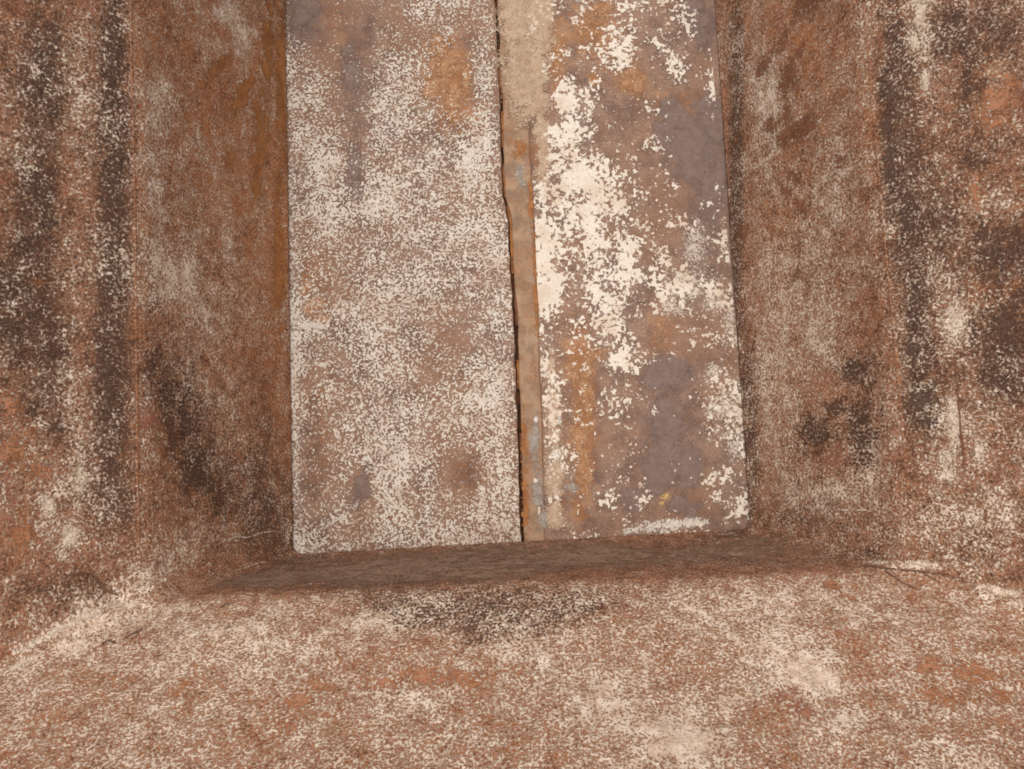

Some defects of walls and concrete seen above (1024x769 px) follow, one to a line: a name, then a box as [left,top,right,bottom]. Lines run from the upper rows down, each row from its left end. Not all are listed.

corrosion [553,0,621,85]
corrosion [753,0,824,150]
corrosion [228,0,334,370]
corrosion [528,177,541,338]
peeling [527,0,750,539]
corrosion [780,167,810,220]
corrosion [303,383,324,503]
corrosion [565,343,614,498]
corrosion [953,345,965,474]
corrosion [272,674,336,739]
corrosion [365,657,488,698]
corrosion [906,655,1018,713]